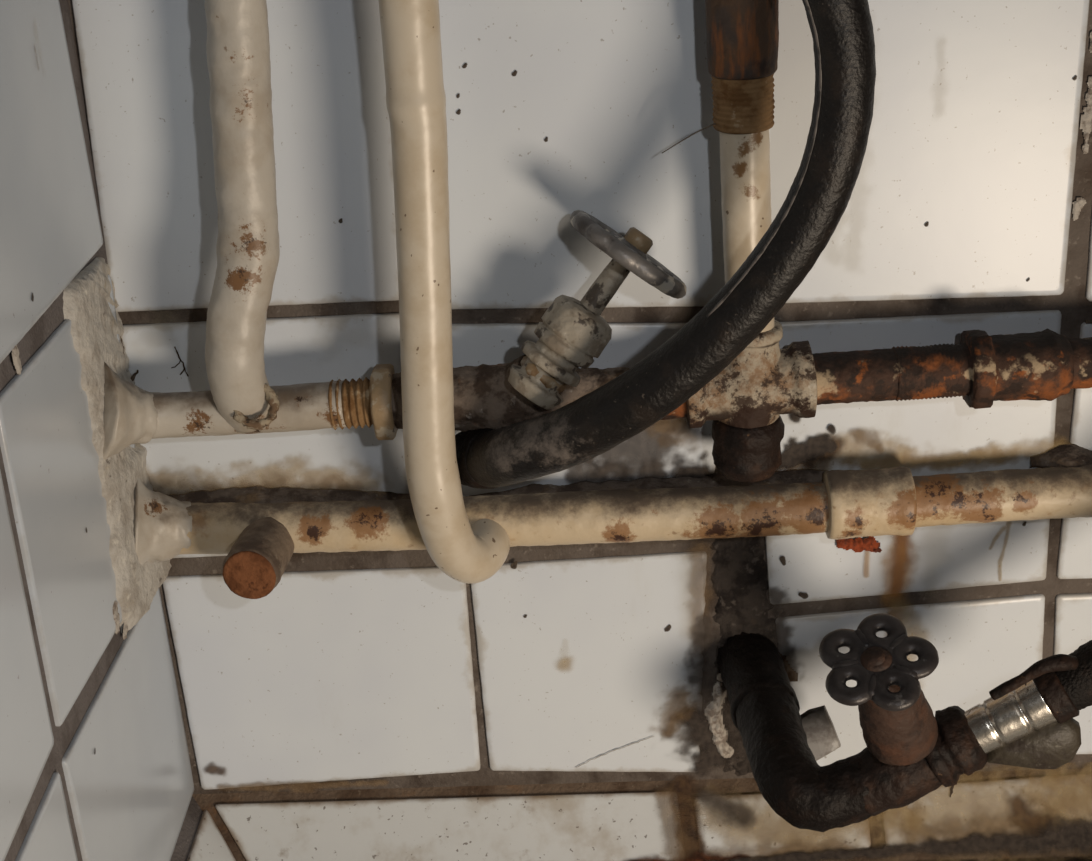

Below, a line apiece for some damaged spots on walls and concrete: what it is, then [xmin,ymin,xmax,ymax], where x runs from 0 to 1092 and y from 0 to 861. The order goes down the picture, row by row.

damp [1073,76,1092,154]
damp [1072,197,1086,221]
rust [892,535,908,594]
rust [671,776,1092,861]